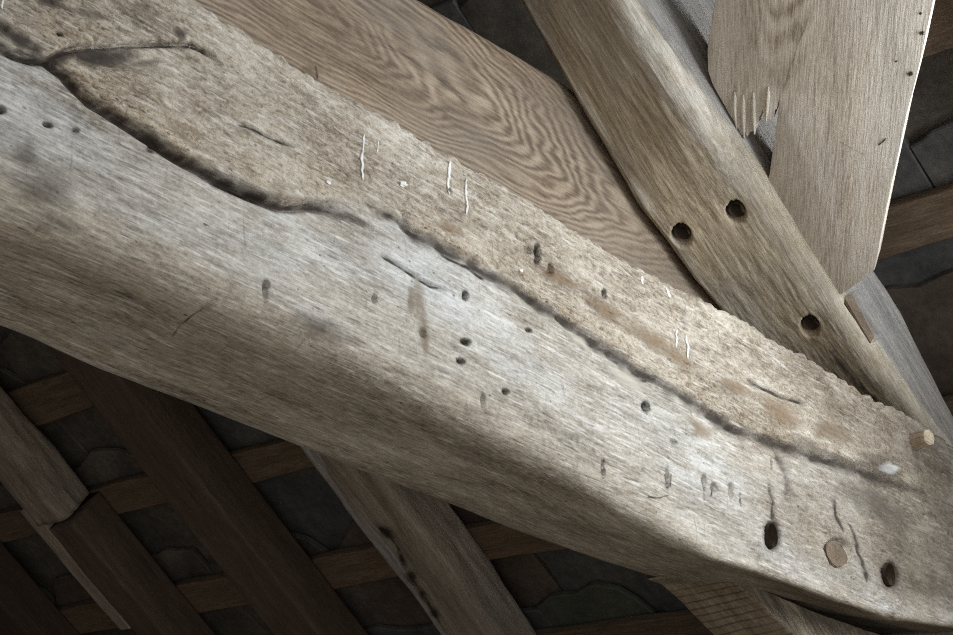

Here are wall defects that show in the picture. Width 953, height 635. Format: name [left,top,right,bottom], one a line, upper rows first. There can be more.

crack [0,24,324,212]
crack [172,308,203,336]
crack [369,205,655,382]
crack [680,395,883,482]
crack [834,508,867,579]